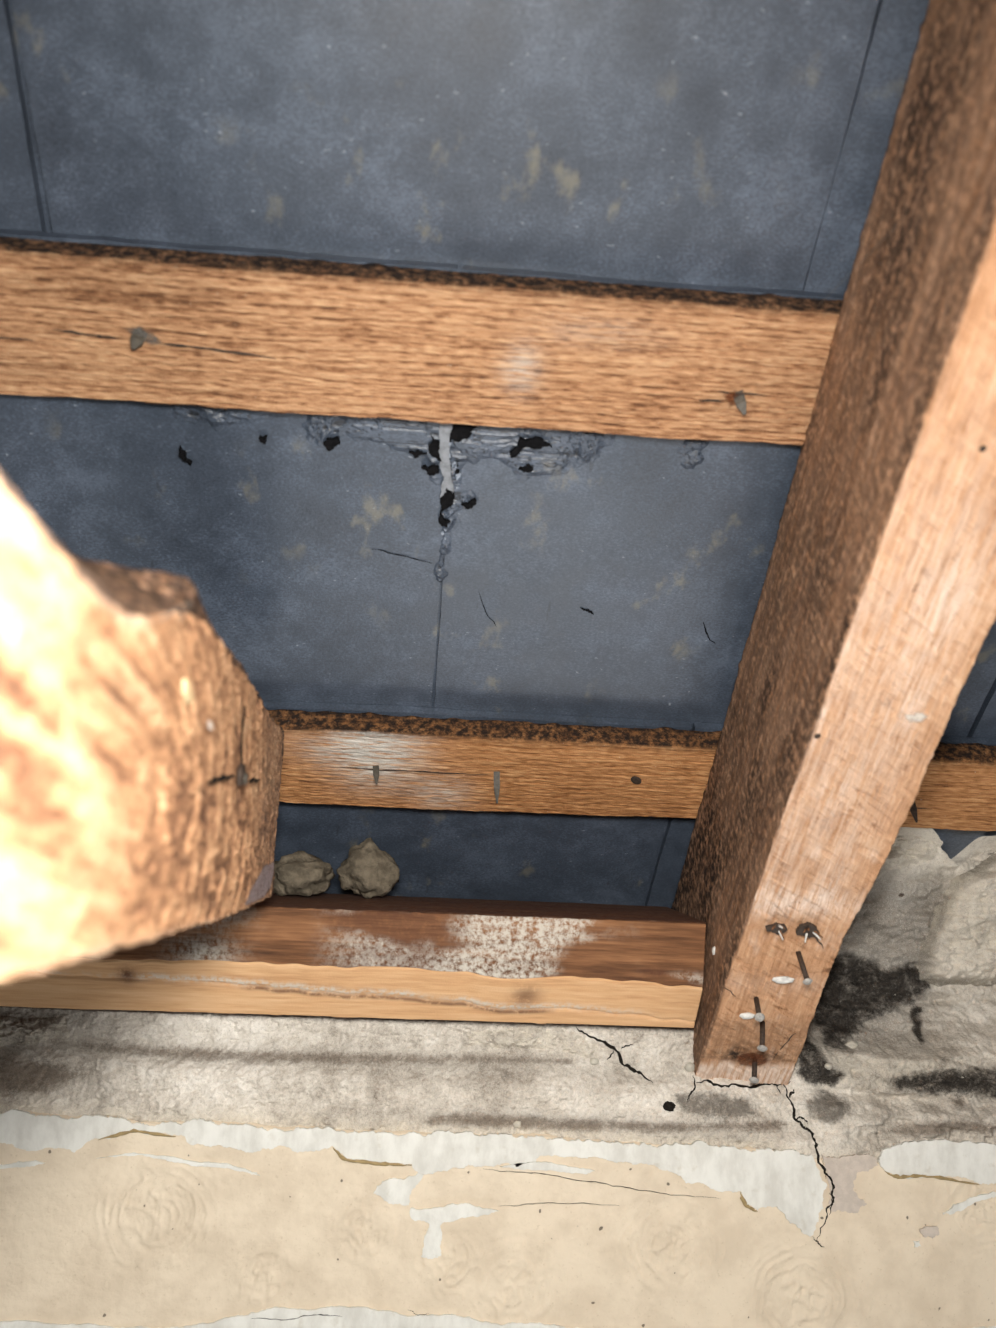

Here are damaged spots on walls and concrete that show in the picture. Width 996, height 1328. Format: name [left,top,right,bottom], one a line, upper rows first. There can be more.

spalling [171,404,271,444]
spalling [178,444,192,466]
spalling [676,439,709,470]
spalling [302,414,615,582]
crack [576,1027,653,1083]
damp [797,955,930,1122]
damp [893,1066,996,1103]
peeling [0,1108,996,1259]
crack [687,1077,835,1247]
peeling [0,1305,578,1328]